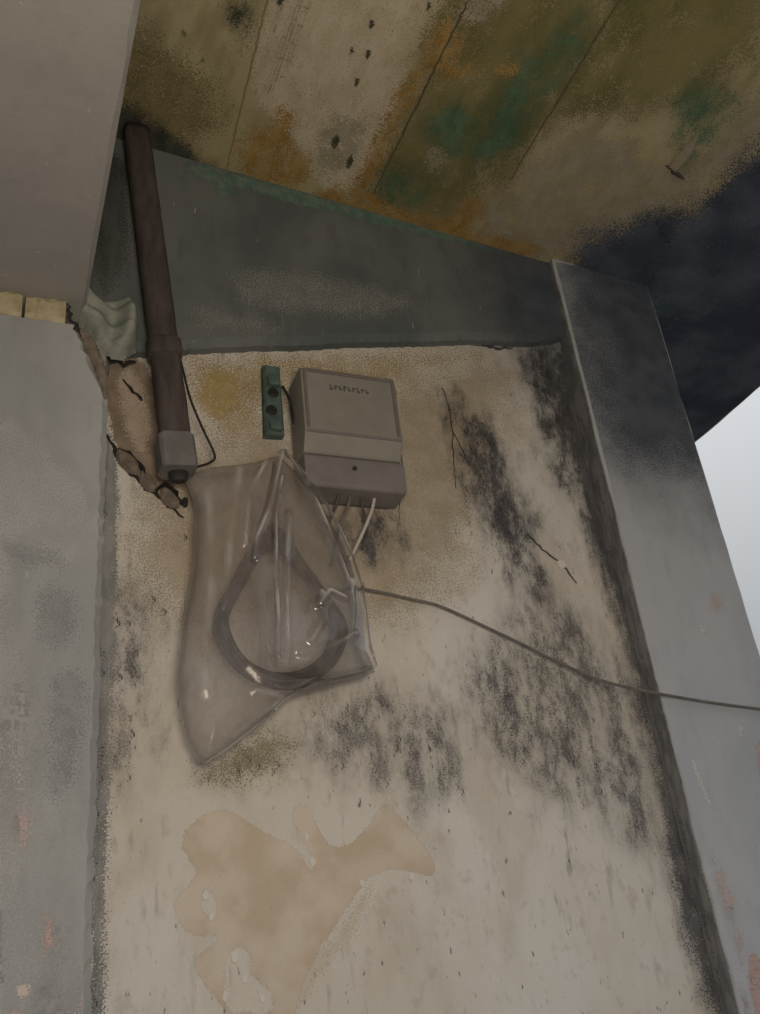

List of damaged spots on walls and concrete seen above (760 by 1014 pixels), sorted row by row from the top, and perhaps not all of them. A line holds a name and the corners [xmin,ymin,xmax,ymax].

damp [116,100,216,166]
damp [223,0,452,195]
rust [227,0,548,260]
damp [91,151,138,300]
damp [190,718,302,796]
damp [310,690,464,804]
peeling [173,804,435,1014]